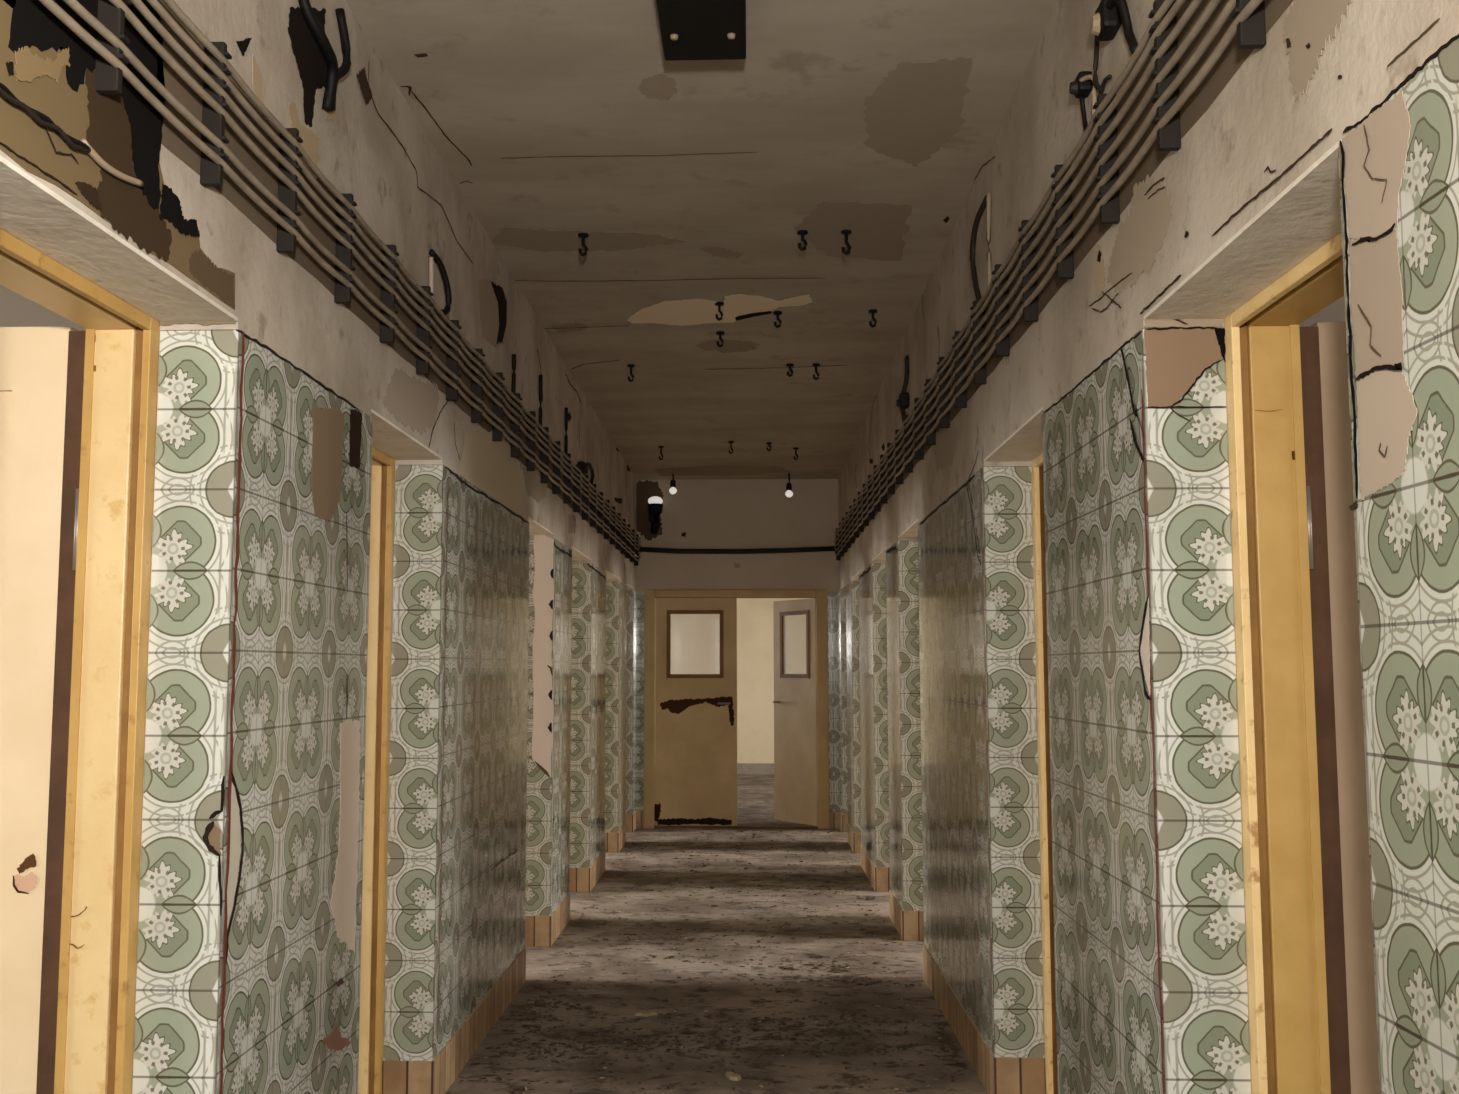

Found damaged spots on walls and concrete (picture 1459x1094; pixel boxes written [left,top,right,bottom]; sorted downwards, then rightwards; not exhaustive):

flaking render [0,0,236,326]
water stain [863,57,972,167]
peeling [627,294,813,326]
peeling [1144,319,1226,407]
peeling [1342,82,1417,510]
peeling [311,407,362,521]
crack [202,771,244,964]